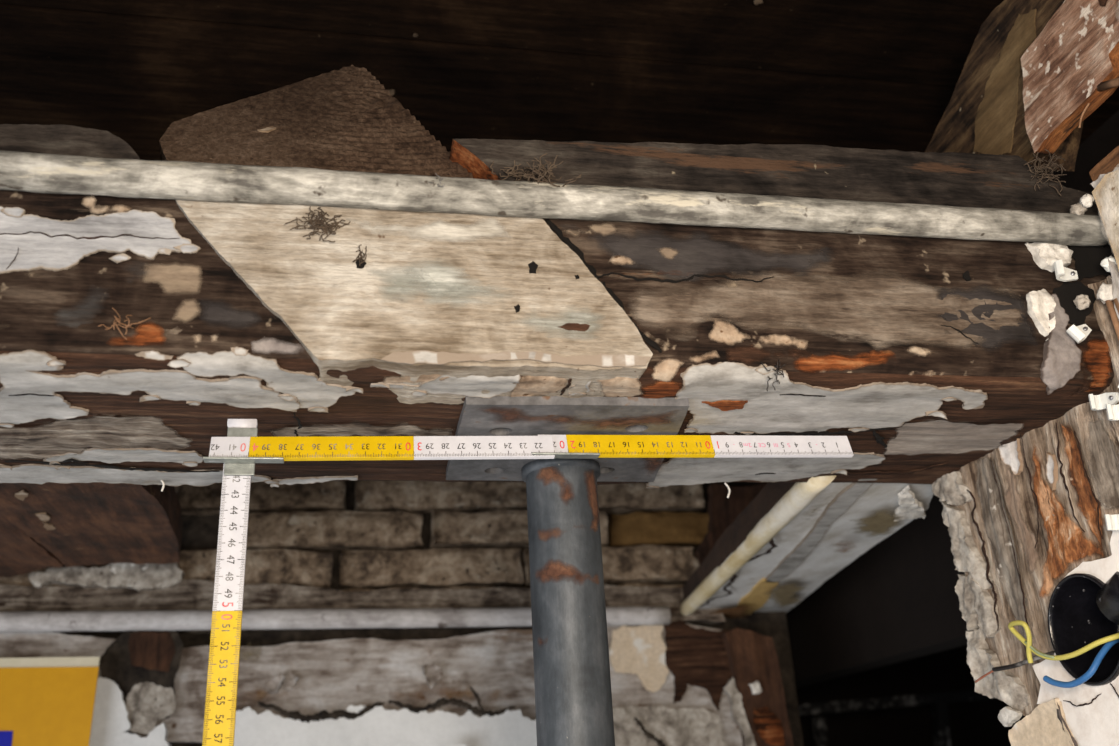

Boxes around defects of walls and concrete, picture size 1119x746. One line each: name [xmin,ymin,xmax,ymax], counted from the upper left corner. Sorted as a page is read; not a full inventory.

peeling [0,206,201,274]
peeling [0,347,651,428]
rust [486,409,671,428]
peeling [0,447,223,487]
peeling [251,475,358,487]
rust [538,466,572,500]
peeling [646,362,1038,572]
peeling [1046,452,1058,491]
rust [537,562,598,582]
flaking render [613,620,756,746]